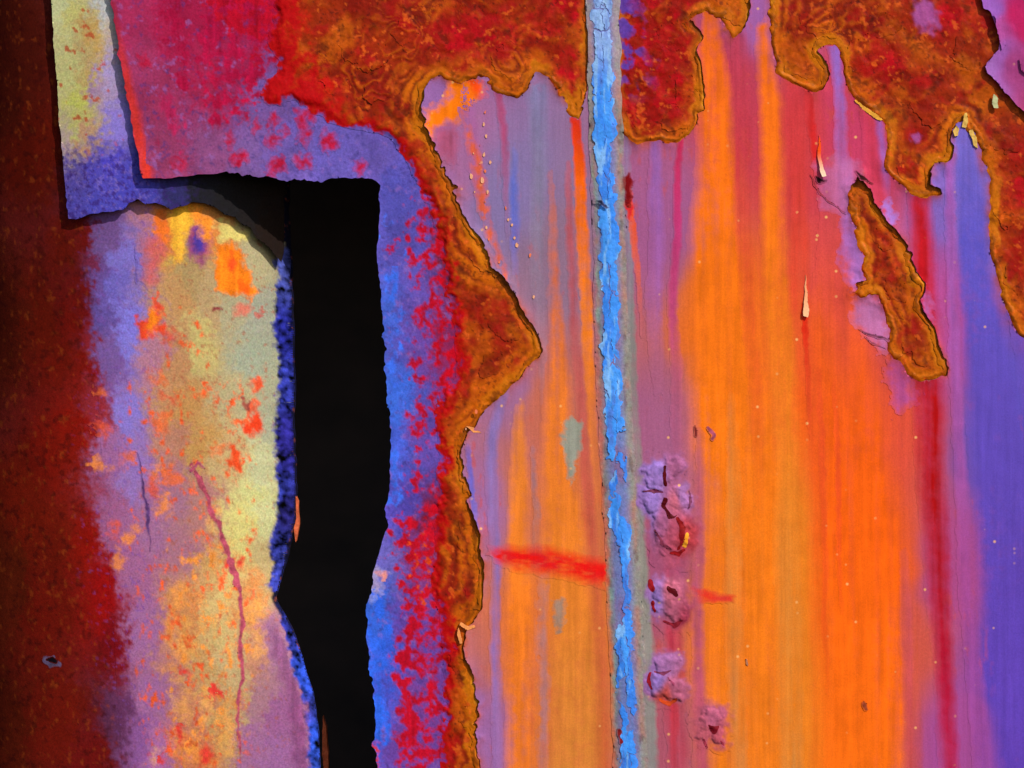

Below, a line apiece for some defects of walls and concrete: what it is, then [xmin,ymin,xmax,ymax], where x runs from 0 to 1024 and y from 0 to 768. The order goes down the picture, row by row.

peeling [110,0,421,210]
peeling [269,243,297,568]
corrosion [85,0,611,768]
corrosion [618,0,1024,768]
peeling [372,484,414,634]
peeling [276,610,321,768]
peeling [371,719,381,767]